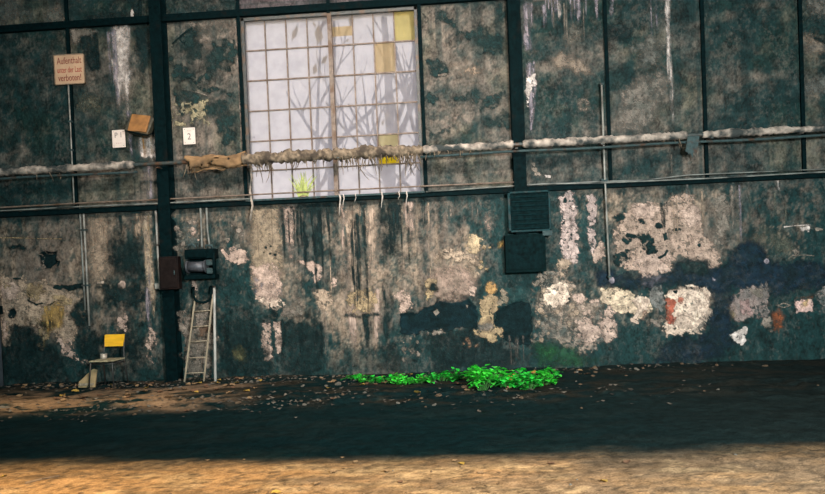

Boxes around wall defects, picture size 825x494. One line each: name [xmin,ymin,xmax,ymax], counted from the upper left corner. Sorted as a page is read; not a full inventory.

damp [47,11,65,22]
damp [70,25,151,99]
damp [524,62,537,130]
damp [523,0,590,74]
damp [607,0,673,130]
peeling [221,205,337,361]
damp [281,199,524,372]
flaking render [394,190,730,355]
peeling [729,283,825,345]